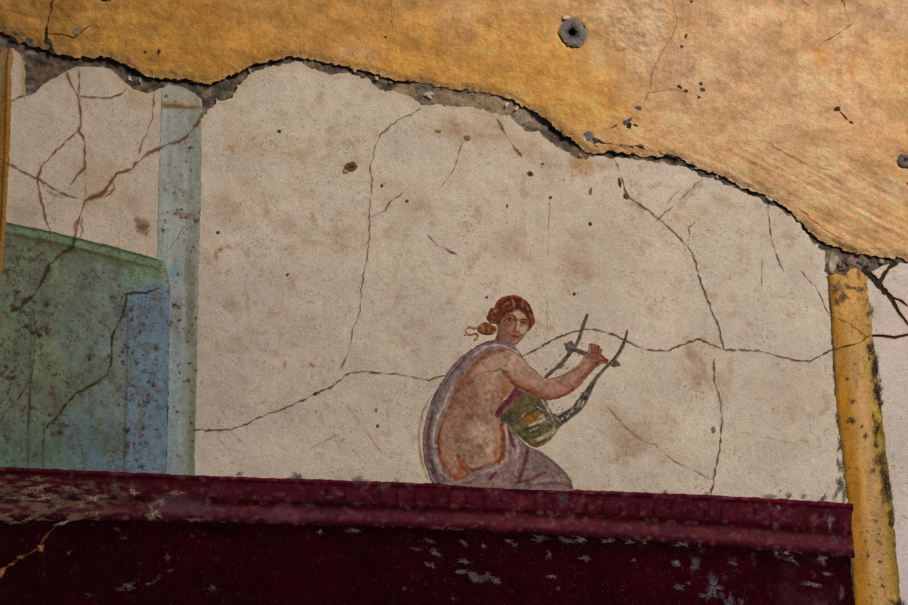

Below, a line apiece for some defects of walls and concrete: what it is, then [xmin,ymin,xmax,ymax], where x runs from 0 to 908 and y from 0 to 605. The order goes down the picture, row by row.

crack [47,0,90,38]
peeling [0,476,121,524]
crack [0,288,159,448]
crack [0,72,204,326]
peeling [146,490,184,518]
crack [193,108,445,431]
spalling [0,25,908,319]
crack [486,137,908,528]
peeling [820,437,847,503]
peeling [836,342,895,528]
peeling [699,576,744,605]